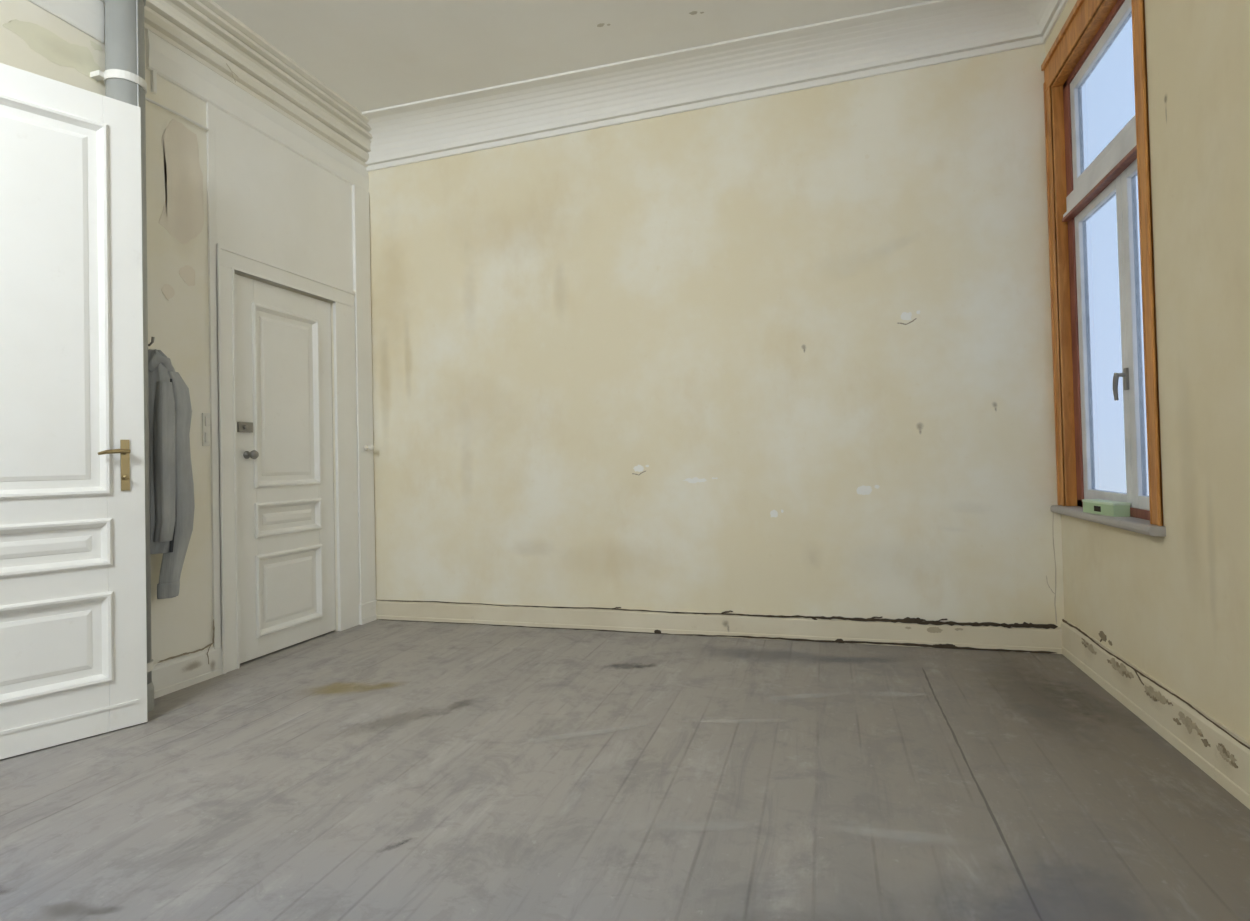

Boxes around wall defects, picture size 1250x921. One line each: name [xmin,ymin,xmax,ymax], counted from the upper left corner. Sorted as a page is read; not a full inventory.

spalling [1081,631,1238,768]